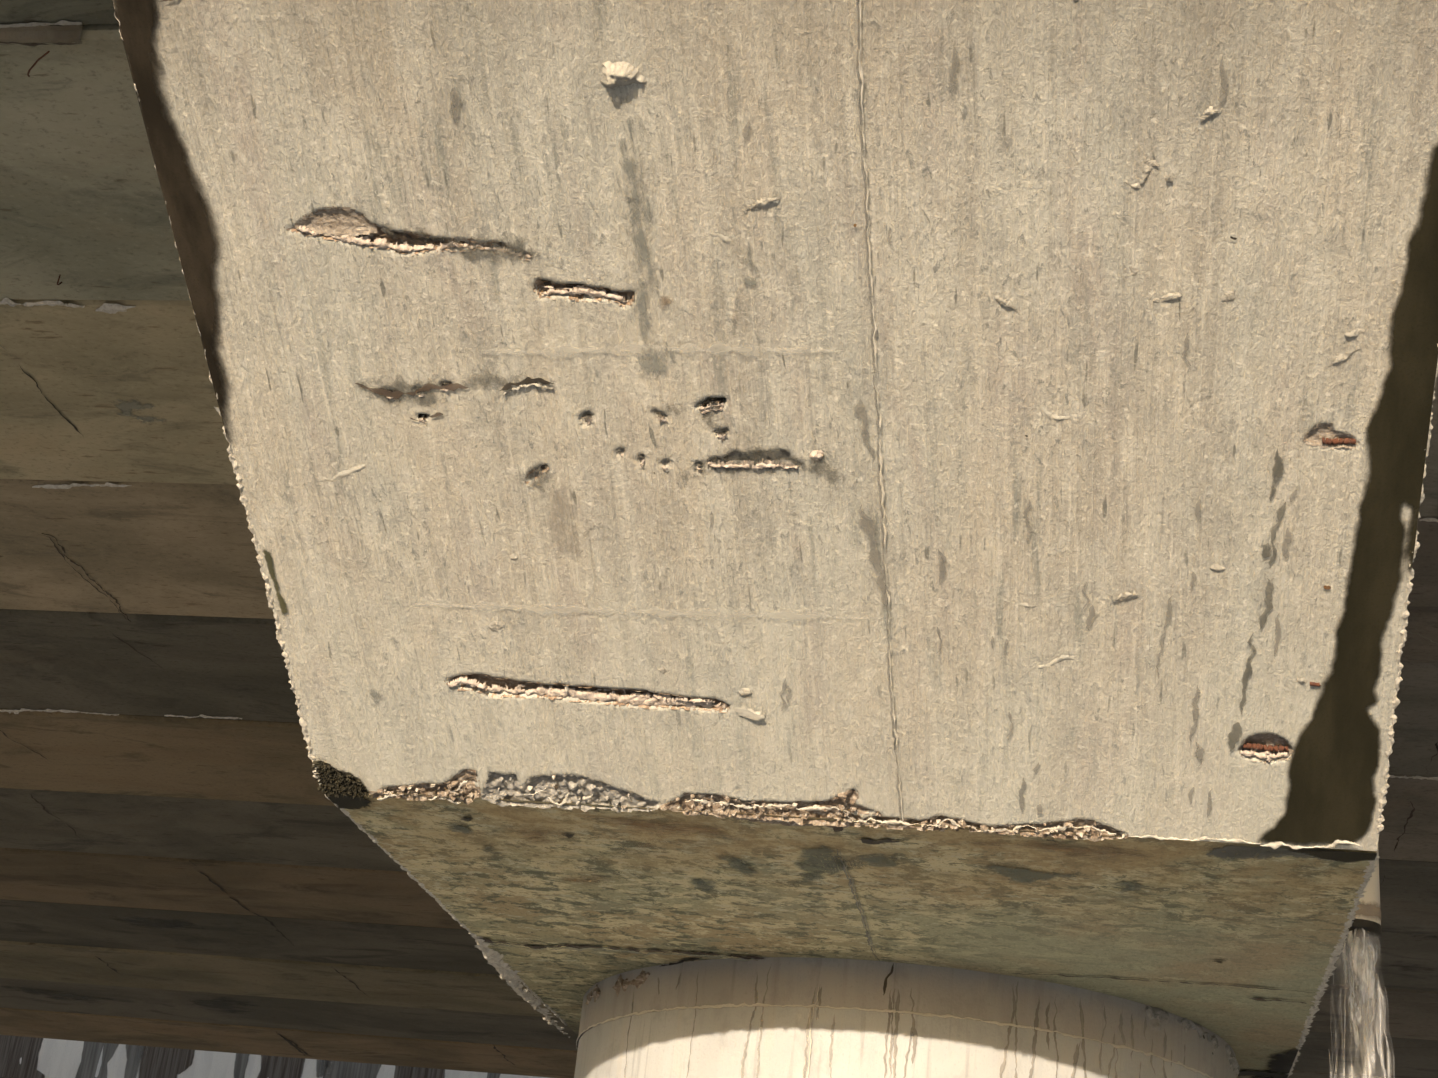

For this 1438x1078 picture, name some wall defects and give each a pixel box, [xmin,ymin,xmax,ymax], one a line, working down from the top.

spalling [284,206,538,261]
spalling [533,280,637,307]
spalling [684,397,837,482]
water stain [1129,143,1438,862]
water stain [938,549,946,582]
water stain [1082,582,1095,630]
spalling [444,673,766,721]
water stain [780,679,791,711]
spalling [369,769,1129,842]
water stain [1019,763,1043,815]
water stain [741,974,768,1078]